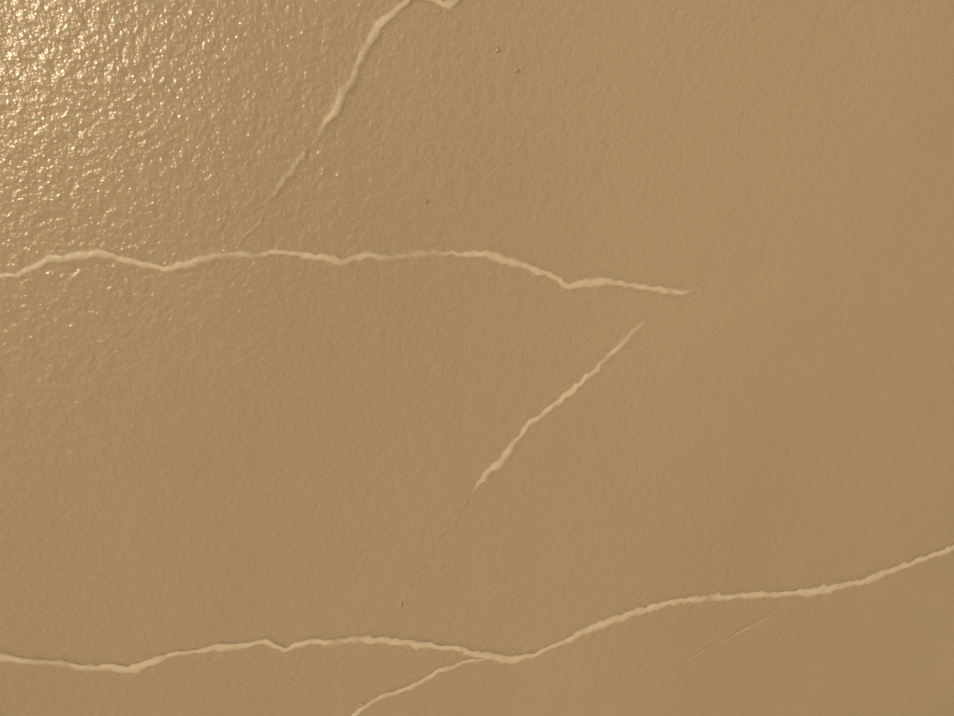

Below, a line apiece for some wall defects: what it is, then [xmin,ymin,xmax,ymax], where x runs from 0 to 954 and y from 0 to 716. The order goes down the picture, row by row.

crack [320,0,461,135]
crack [0,249,697,296]
crack [474,321,645,491]
crack [0,544,954,716]